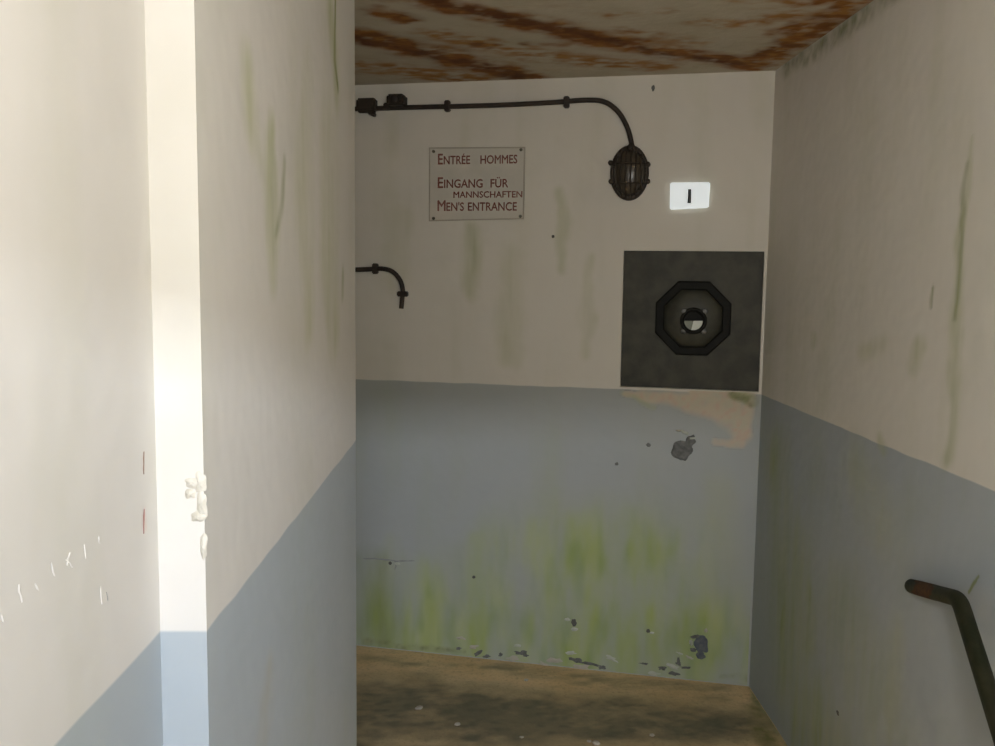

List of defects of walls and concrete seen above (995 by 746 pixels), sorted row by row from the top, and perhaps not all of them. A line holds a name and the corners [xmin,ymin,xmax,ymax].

rust [355,0,873,83]
water stain [950,155,972,327]
spalling [671,430,696,461]
peeling [616,388,760,451]
water stain [546,463,754,642]
peeling [456,636,529,662]
water stain [356,525,752,746]
peeling [539,651,618,670]
spalling [640,628,708,677]